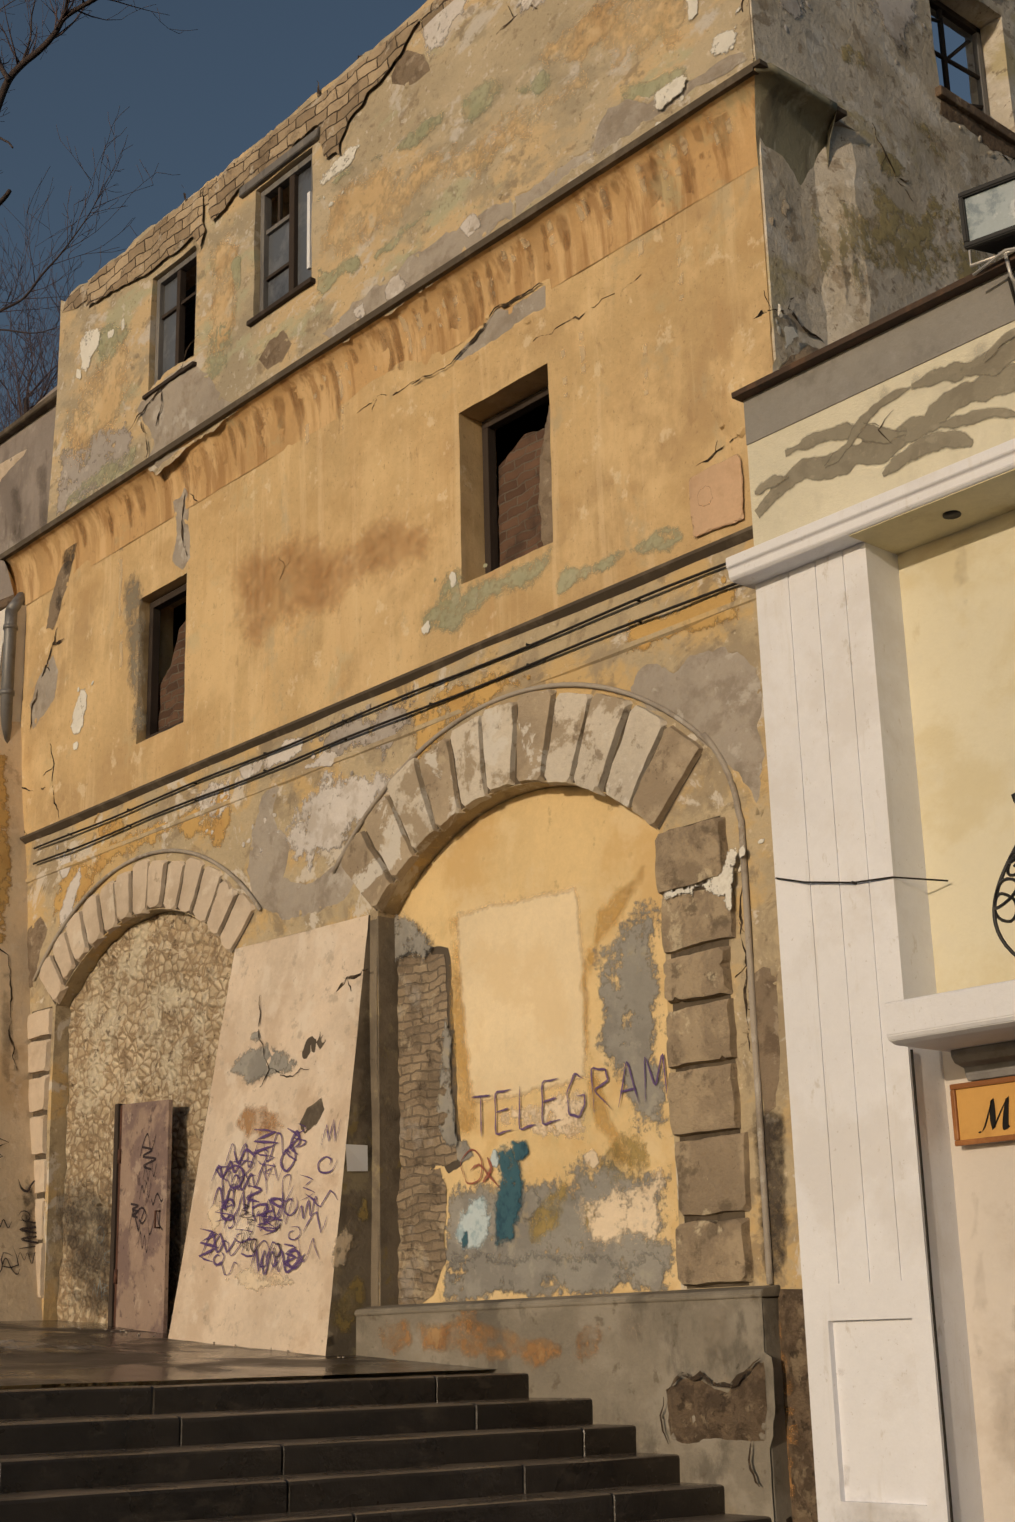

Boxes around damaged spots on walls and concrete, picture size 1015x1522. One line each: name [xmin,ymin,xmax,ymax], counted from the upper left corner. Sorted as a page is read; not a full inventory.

flaking render [56,0,754,516]
crack [357,282,542,413]
crack [533,276,640,341]
peeling [421,527,682,634]
flaking render [27,553,75,734]
peeling [0,755,12,943]
flaking render [27,671,531,994]
flaking render [256,965,331,1082]
flaking render [294,1090,329,1142]
peeling [490,1092,585,1168]
peeling [584,1137,647,1169]
flaking render [658,1351,775,1455]